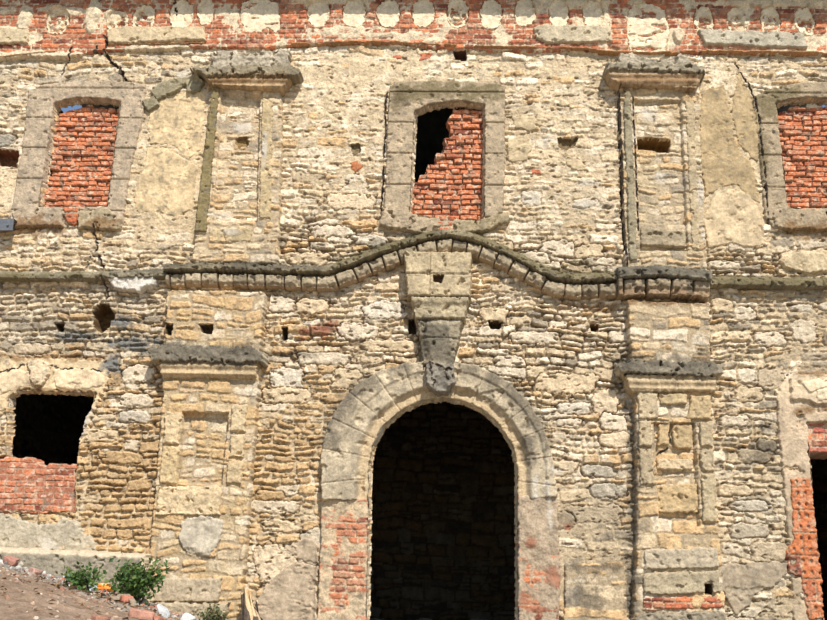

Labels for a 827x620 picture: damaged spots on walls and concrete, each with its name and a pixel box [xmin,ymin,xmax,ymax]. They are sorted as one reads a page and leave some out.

crack [93,34,129,82]
crack [734,63,770,224]
crack [86,221,109,306]